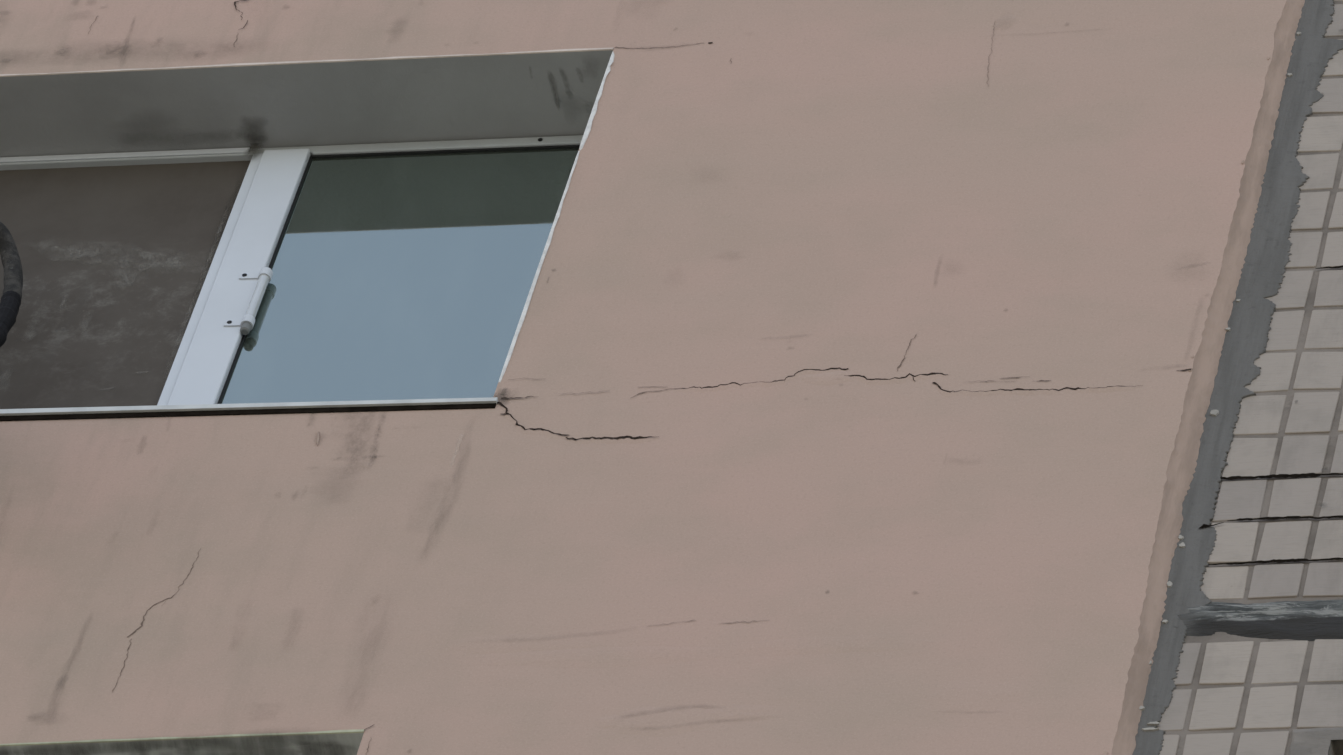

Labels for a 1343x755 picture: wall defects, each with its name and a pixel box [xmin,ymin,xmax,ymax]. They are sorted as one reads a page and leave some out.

crack [496,335,1142,445]
crack [112,549,201,691]